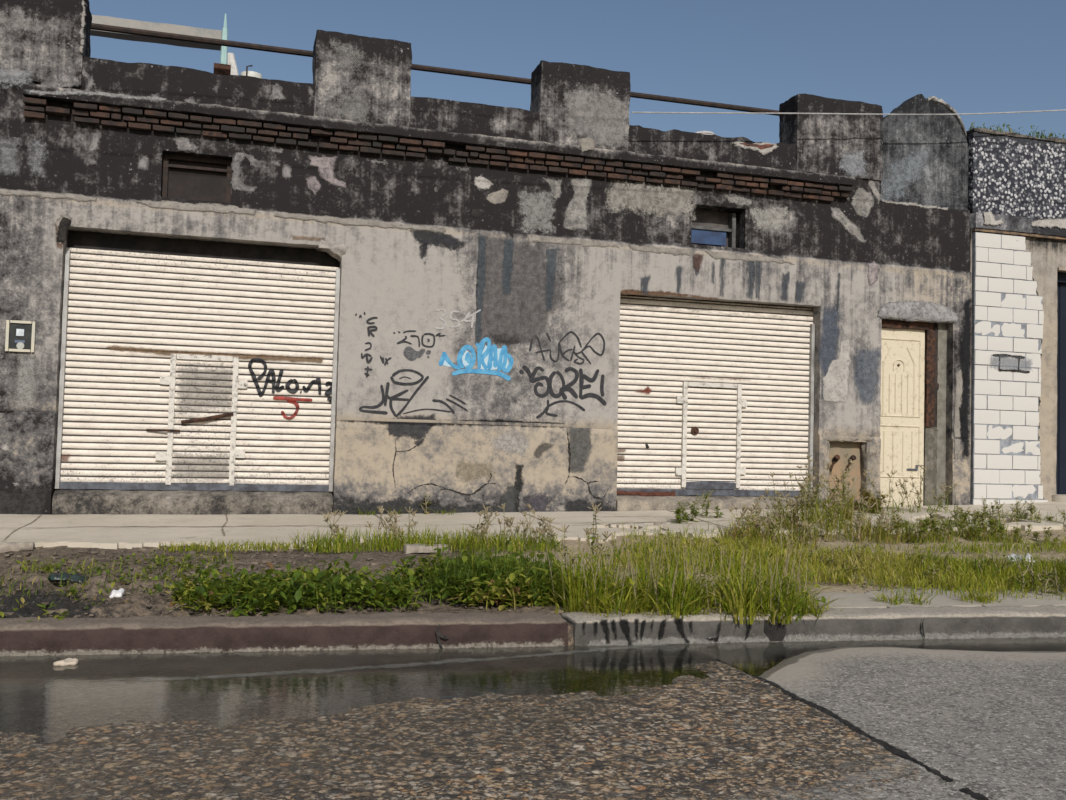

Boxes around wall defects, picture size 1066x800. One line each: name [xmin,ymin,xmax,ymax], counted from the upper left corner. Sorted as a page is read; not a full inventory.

peeling [137,153,161,171]
peeling [173,136,199,152]
peeling [230,147,292,193]
peeling [306,155,346,195]
peeling [450,166,494,190]
peeling [134,200,256,215]
peeling [272,211,446,233]
leakage [409,228,465,264]
leakage [475,236,558,344]
peeling [822,339,851,403]
crack [392,441,502,496]
crack [565,432,609,499]